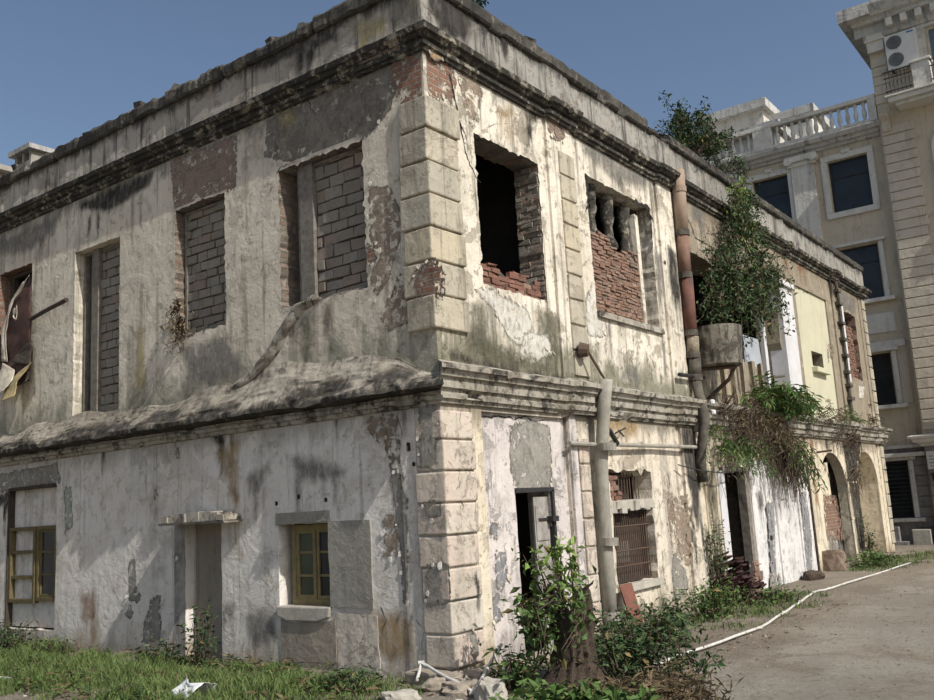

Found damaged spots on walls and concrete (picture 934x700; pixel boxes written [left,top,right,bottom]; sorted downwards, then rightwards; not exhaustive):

flaking render [263,45,483,162]
crack [449,74,516,183]
water stain [81,173,153,231]
flaking render [170,134,237,209]
peeling [366,181,446,332]
water stain [452,305,547,375]
peeling [474,285,556,368]
water stain [538,313,559,358]
flaking render [362,412,409,606]
peeling [420,500,441,524]
peeling [124,559,163,645]
peeling [424,561,451,608]